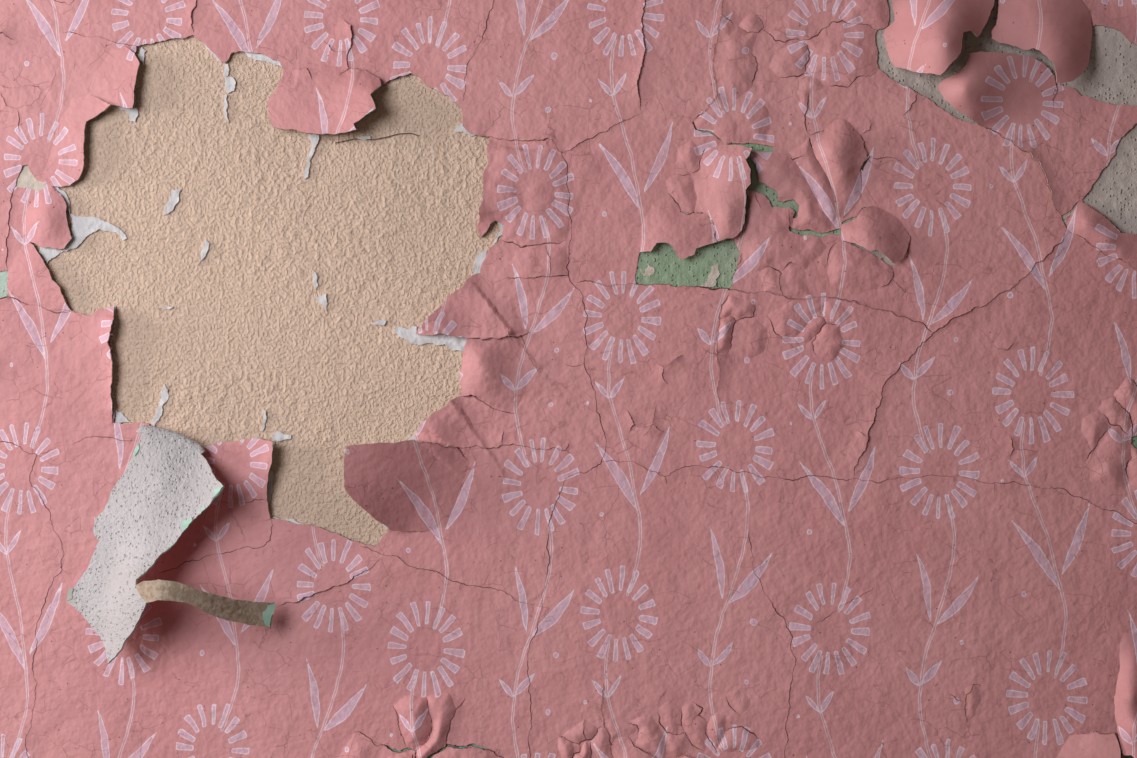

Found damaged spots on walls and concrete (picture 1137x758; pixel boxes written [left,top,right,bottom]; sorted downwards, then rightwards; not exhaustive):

peeling [875,0,1137,132]
peeling [1061,123,1137,260]
flaking render [0,36,537,546]
crack [313,1,1137,756]
peeling [1056,631,1137,758]